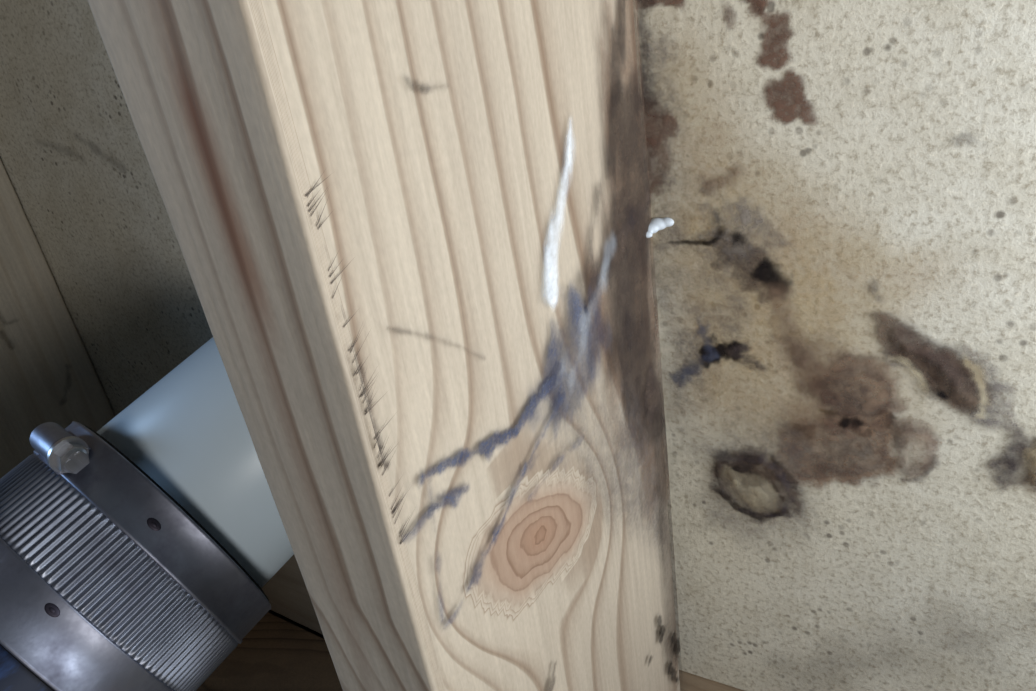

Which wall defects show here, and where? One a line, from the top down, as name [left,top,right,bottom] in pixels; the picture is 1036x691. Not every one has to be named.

water stain [747,0,815,124]
water stain [412,0,684,607]
water stain [673,326,764,385]
water stain [690,202,789,321]
water stain [778,344,937,487]
water stain [989,429,1036,486]